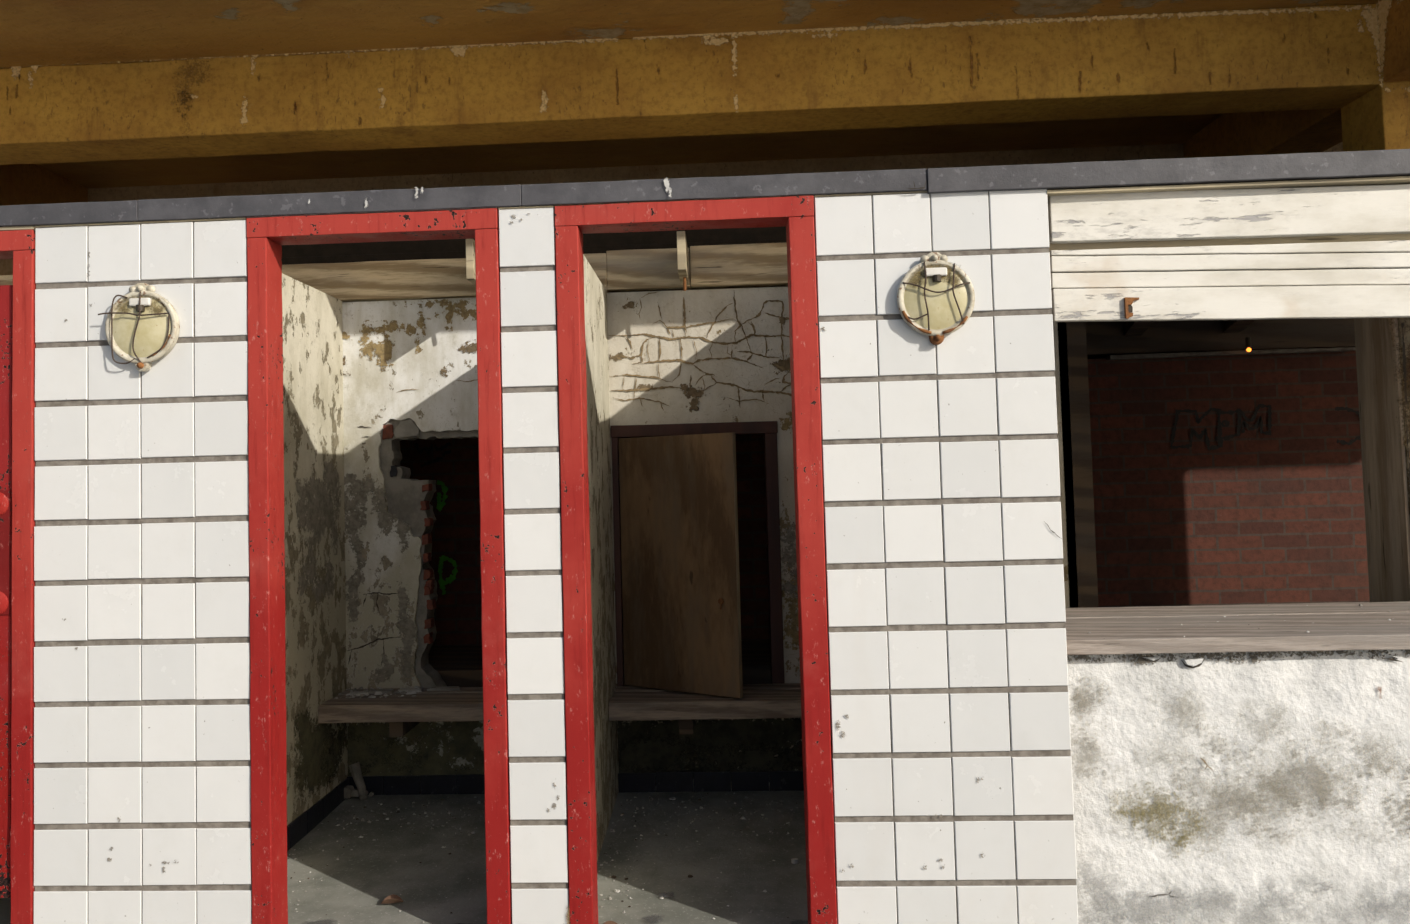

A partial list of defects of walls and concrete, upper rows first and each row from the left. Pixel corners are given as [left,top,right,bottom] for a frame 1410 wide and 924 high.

peeling [342,299,477,376]
crack [609,291,791,411]
leakage [1110,784,1204,857]